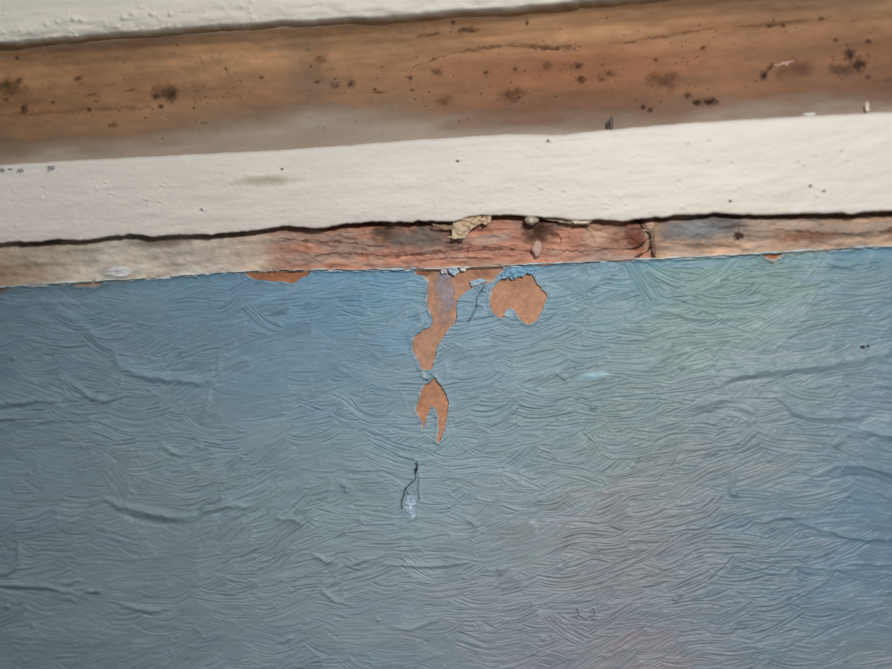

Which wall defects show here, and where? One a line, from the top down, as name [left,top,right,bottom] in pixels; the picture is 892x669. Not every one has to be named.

damp [0,0,892,144]
peeling [246,211,892,442]
crack [401,463,418,521]